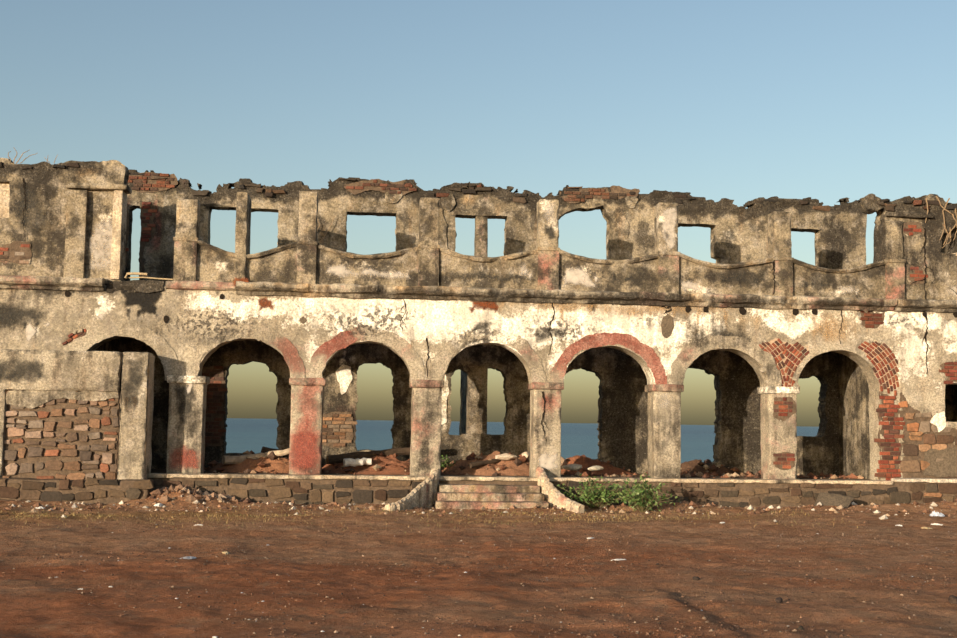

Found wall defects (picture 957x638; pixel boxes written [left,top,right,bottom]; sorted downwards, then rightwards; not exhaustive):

efflorescence [328,266,408,278]
leakage [452,267,531,283]
leakage [564,269,597,286]
crack [913,228,957,374]
leakage [0,304,43,337]
crack [545,303,555,355]
leakage [0,360,43,381]
flaking render [551,311,957,507]
peeling [538,453,557,470]